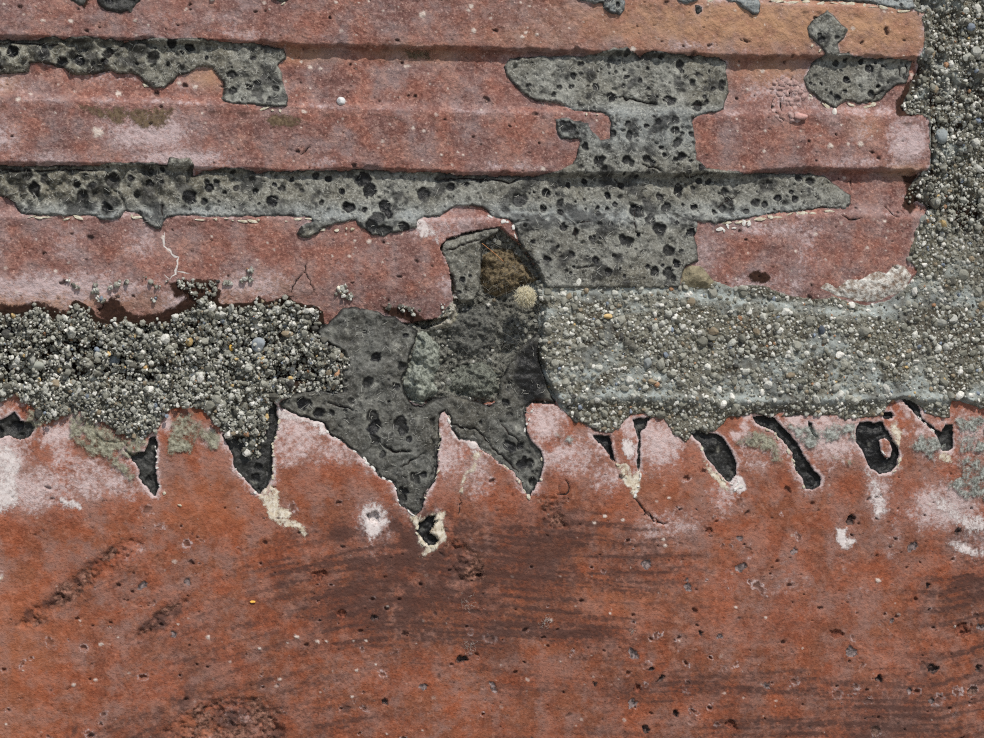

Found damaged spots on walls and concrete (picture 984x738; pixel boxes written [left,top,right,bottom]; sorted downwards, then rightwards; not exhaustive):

peeling [727,0,915,123]
peeling [0,36,851,302]
crack [162,233,188,279]
water stain [0,443,20,512]
peeling [0,412,35,439]
water stain [59,497,81,510]
peeling [125,437,166,496]
peeling [222,306,566,581]
peeling [691,430,744,491]
peeling [753,415,821,489]
peeling [855,412,901,474]
water stain [931,491,984,556]